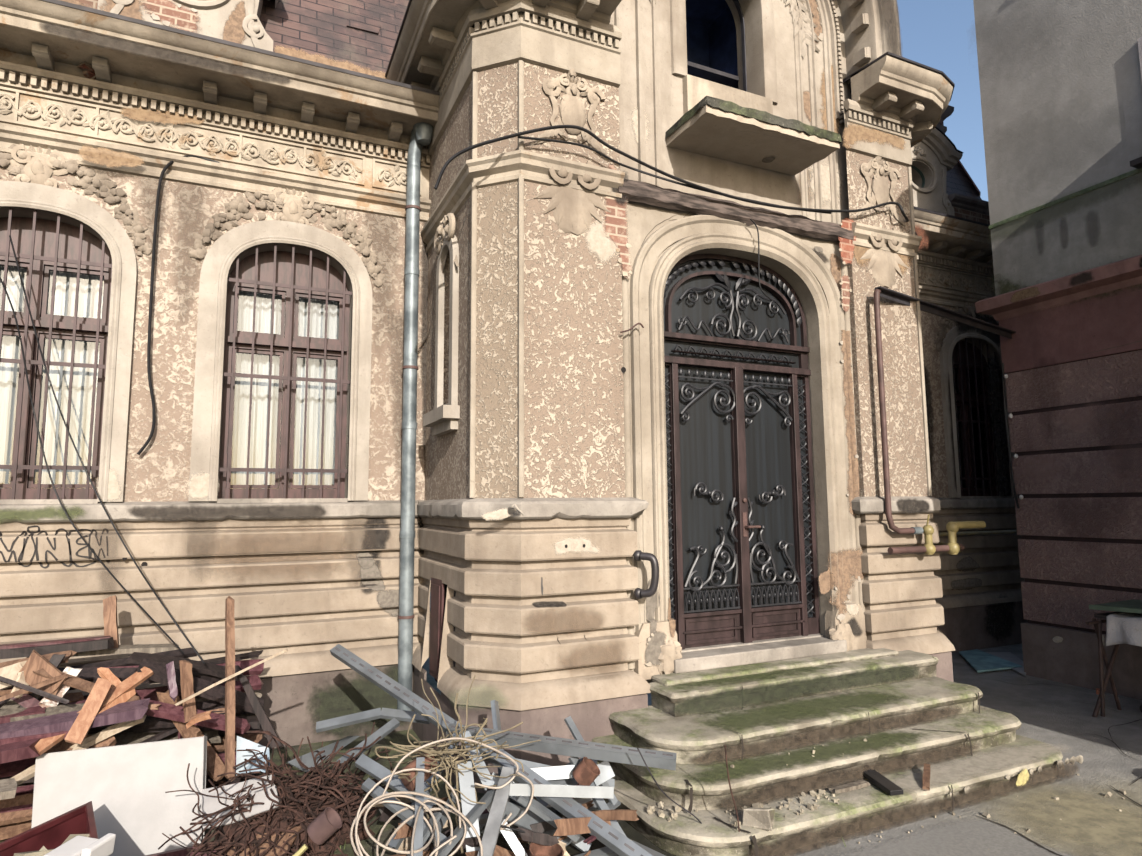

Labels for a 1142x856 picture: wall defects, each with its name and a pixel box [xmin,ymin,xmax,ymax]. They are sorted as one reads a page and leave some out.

flaking render [99,0,199,32]
flaking render [810,164,843,203]
flaking render [586,196,632,279]
flaking render [830,218,871,312]
flaking render [840,330,860,516]
flaking render [645,580,676,666]
flaking render [819,548,864,636]
damp [985,597,1015,640]